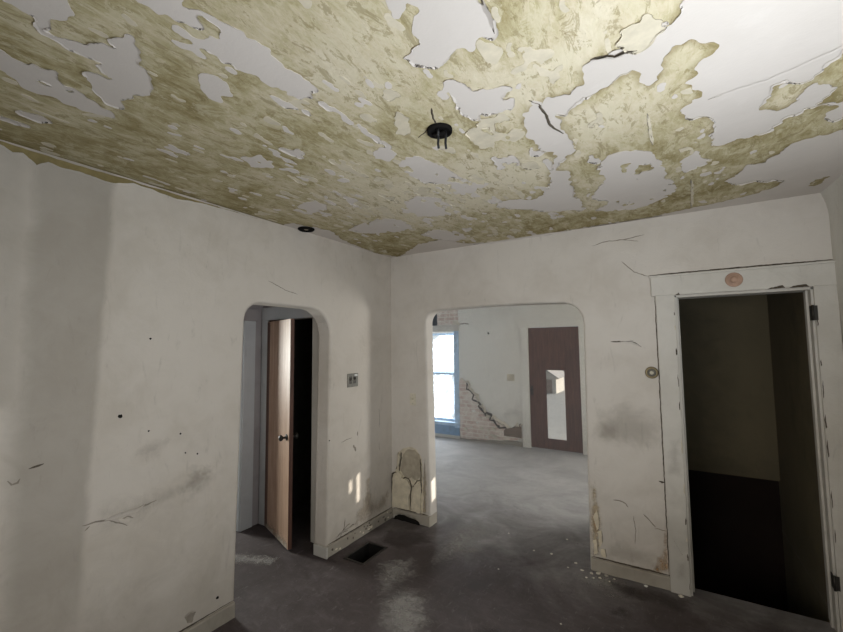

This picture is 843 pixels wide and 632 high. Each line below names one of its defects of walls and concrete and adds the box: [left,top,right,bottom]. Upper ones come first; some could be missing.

peeling [0,0,843,257]
crack [529,100,564,134]
flaking render [347,447,424,539]